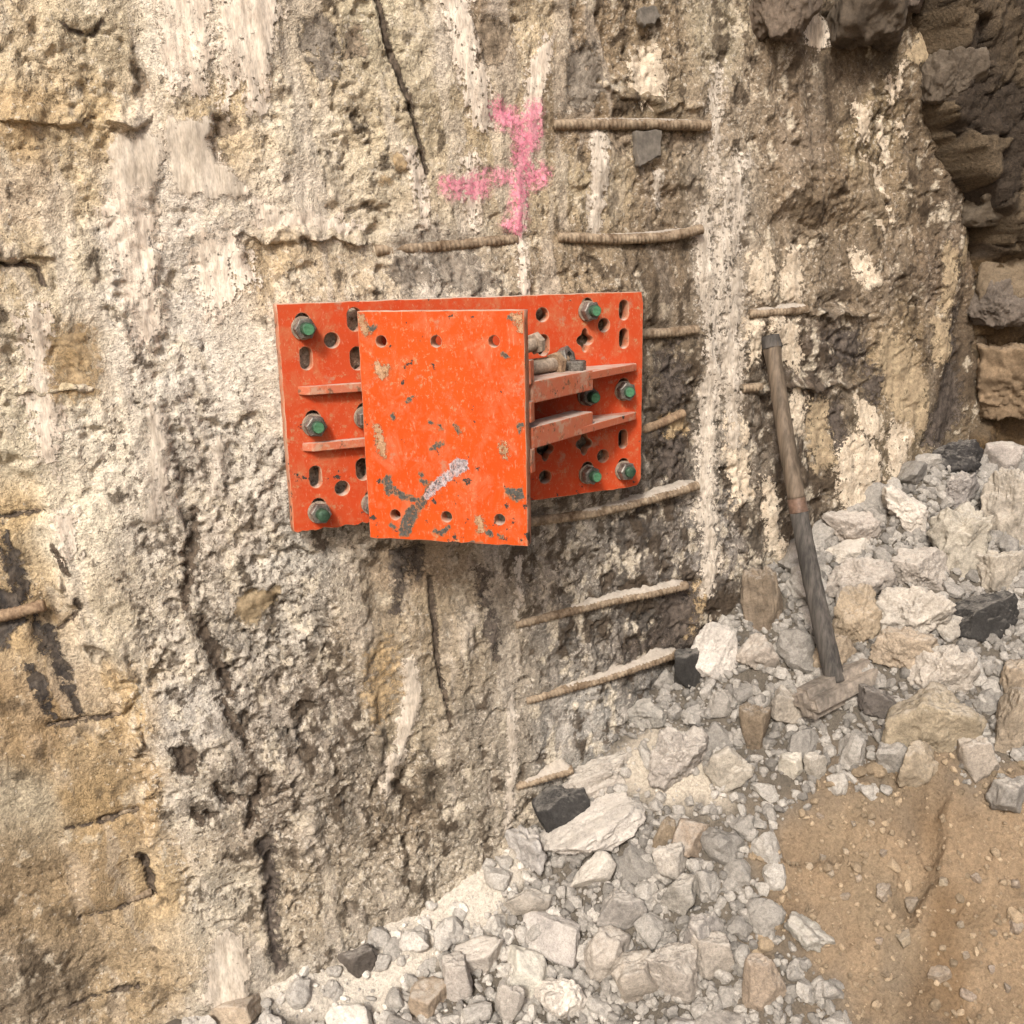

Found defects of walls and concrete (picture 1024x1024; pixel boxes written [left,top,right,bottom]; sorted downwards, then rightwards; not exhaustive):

crack [375,0,429,175]
spalling [553,39,712,168]
spalling [558,224,705,245]
spalling [643,325,700,339]
spalling [642,409,686,434]
rust [658,412,690,438]
peeling [504,485,525,503]
spalling [531,479,700,527]
spalling [516,579,689,629]
crack [426,575,454,728]
spalling [526,647,676,705]